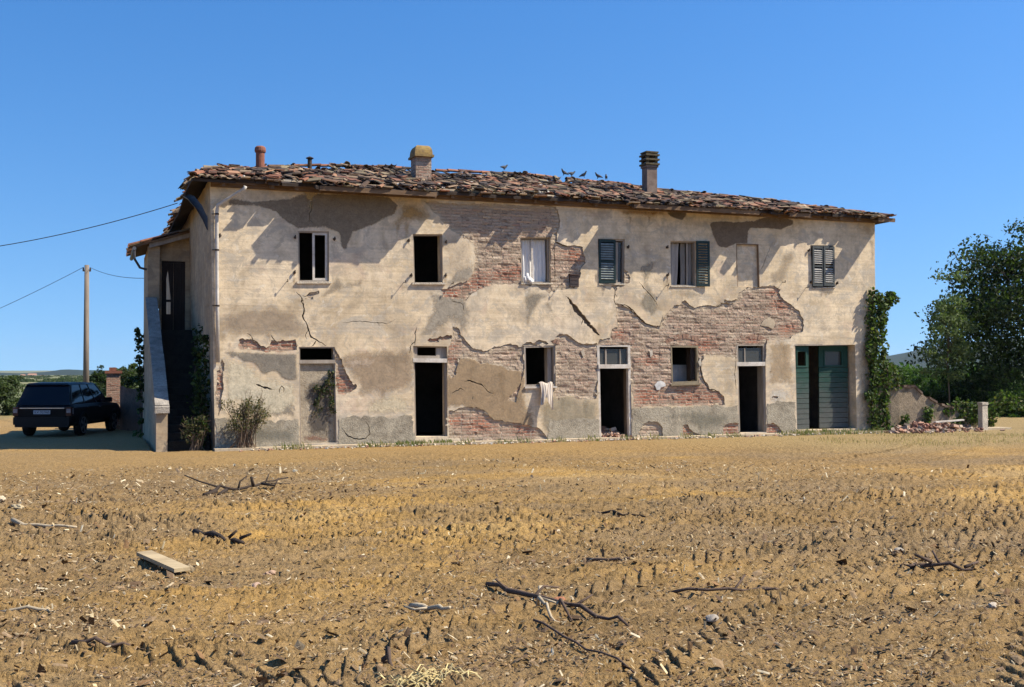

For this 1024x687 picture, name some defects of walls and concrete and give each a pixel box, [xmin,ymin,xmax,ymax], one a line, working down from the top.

crack [297,293,326,346]
spalling [424,201,804,408]
peeling [215,336,298,415]
spalling [335,350,357,395]
spalling [445,407,547,441]
spalling [635,421,663,437]
spalling [766,423,781,433]